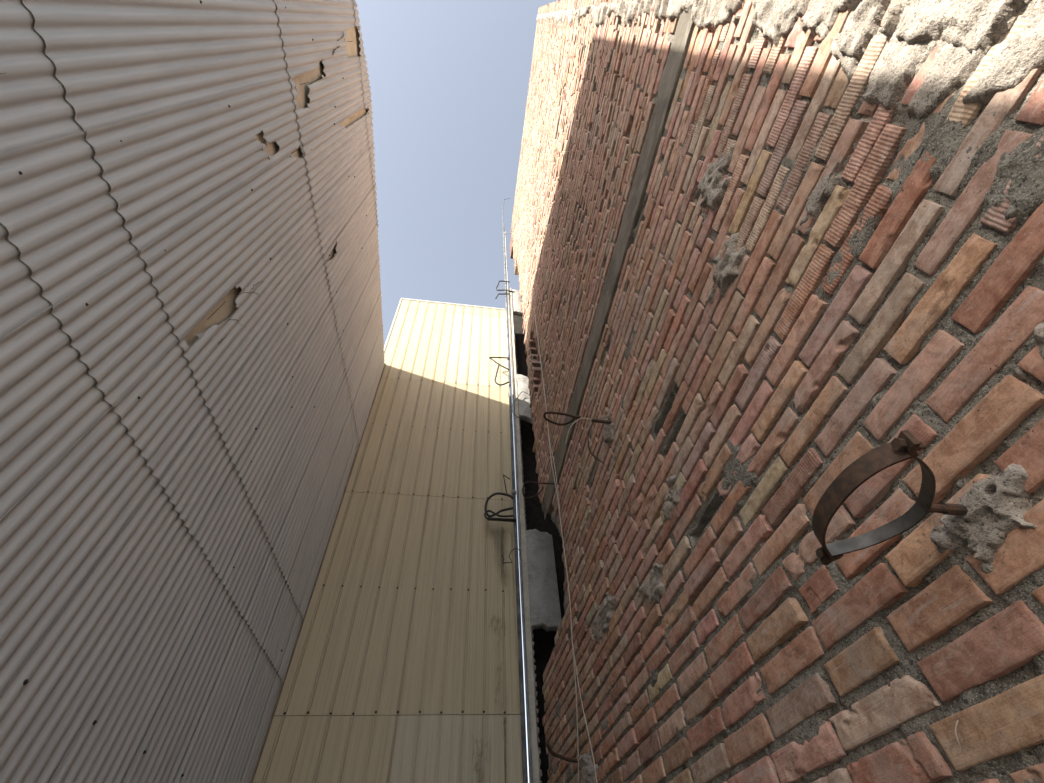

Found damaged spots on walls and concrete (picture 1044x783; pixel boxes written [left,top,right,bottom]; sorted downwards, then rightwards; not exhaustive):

spalling [344,26,359,58]
spalling [293,60,325,109]
spalling [339,108,369,128]
spalling [256,134,278,160]
spalling [184,277,245,344]